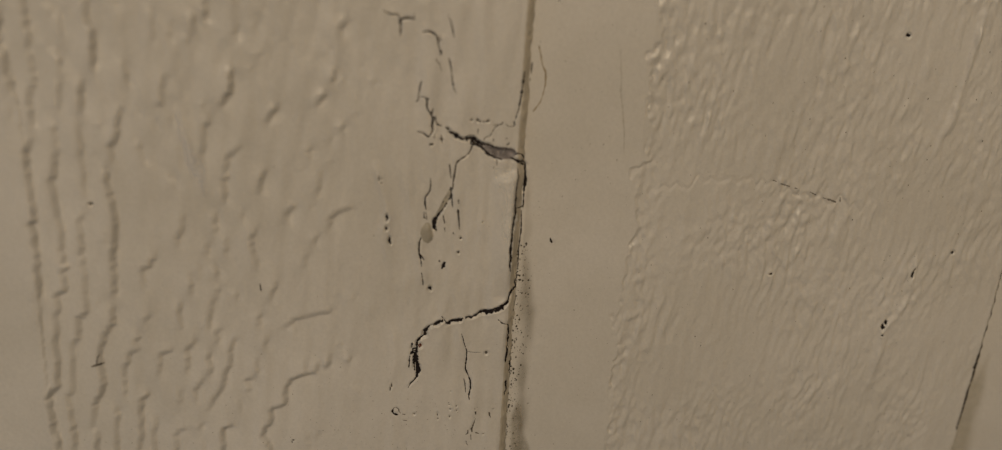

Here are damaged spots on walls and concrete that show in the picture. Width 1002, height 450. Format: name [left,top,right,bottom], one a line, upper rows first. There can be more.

crack [383,10,533,284]
crack [408,272,517,445]